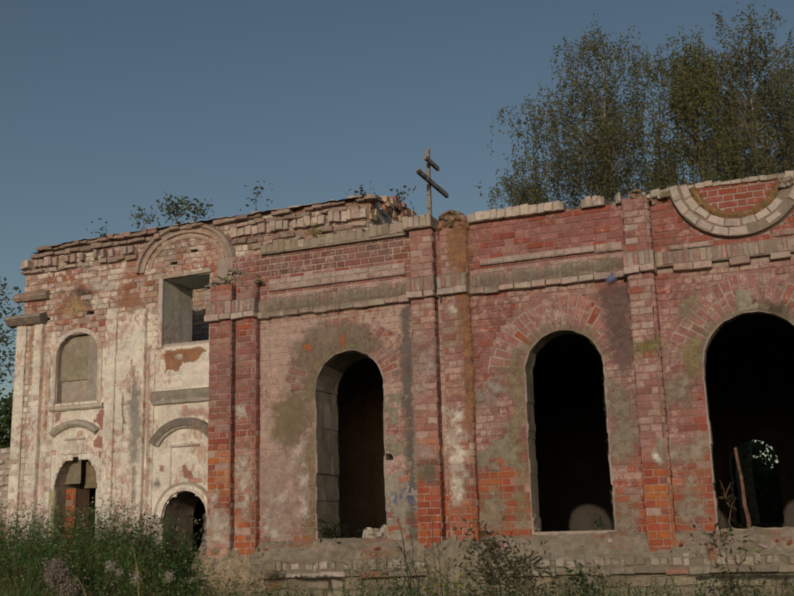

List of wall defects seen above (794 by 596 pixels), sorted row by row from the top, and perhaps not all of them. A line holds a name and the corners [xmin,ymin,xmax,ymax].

peeling [164,347,206,371]
leakage [272,390,307,446]
leakage [447,410,466,464]
leakage [452,475,465,500]